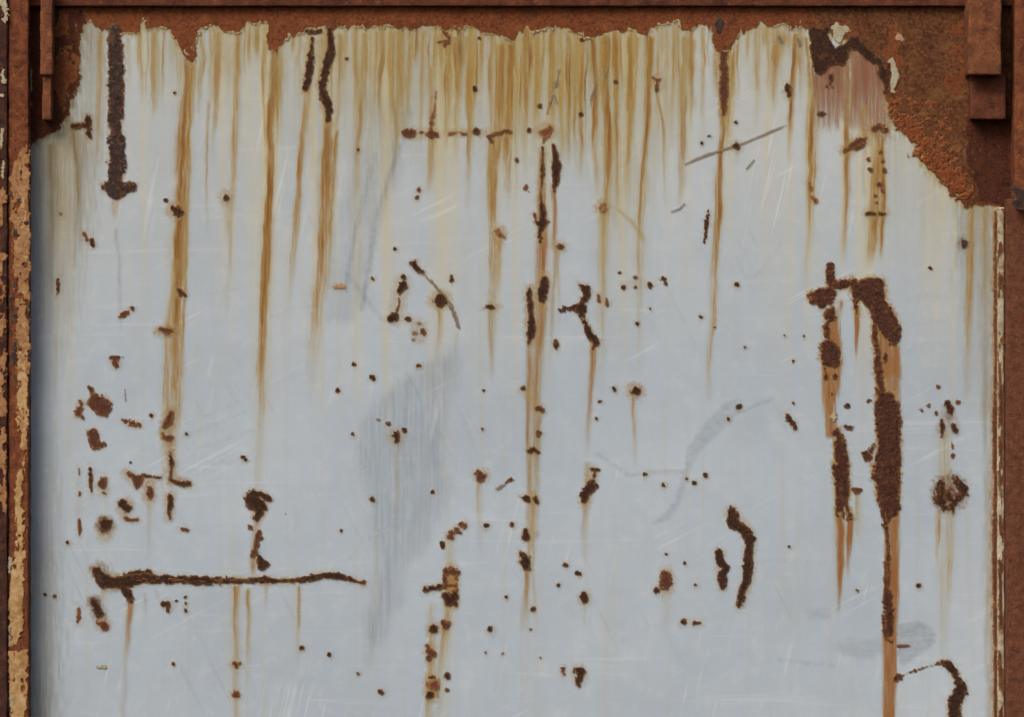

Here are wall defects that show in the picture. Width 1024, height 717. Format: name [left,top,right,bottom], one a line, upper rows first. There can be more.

corrosion [31,6,1024,396]
corrosion [73,385,113,450]
corrosion [126,47,196,500]
corrosion [520,124,564,454]
corrosion [557,284,609,420]
corrosion [95,498,139,534]
corrosion [243,488,272,572]
corrosion [509,493,539,593]
corrosion [579,467,600,505]
corrosion [714,505,756,608]
corrosion [806,262,969,717]
corrosion [422,566,461,705]